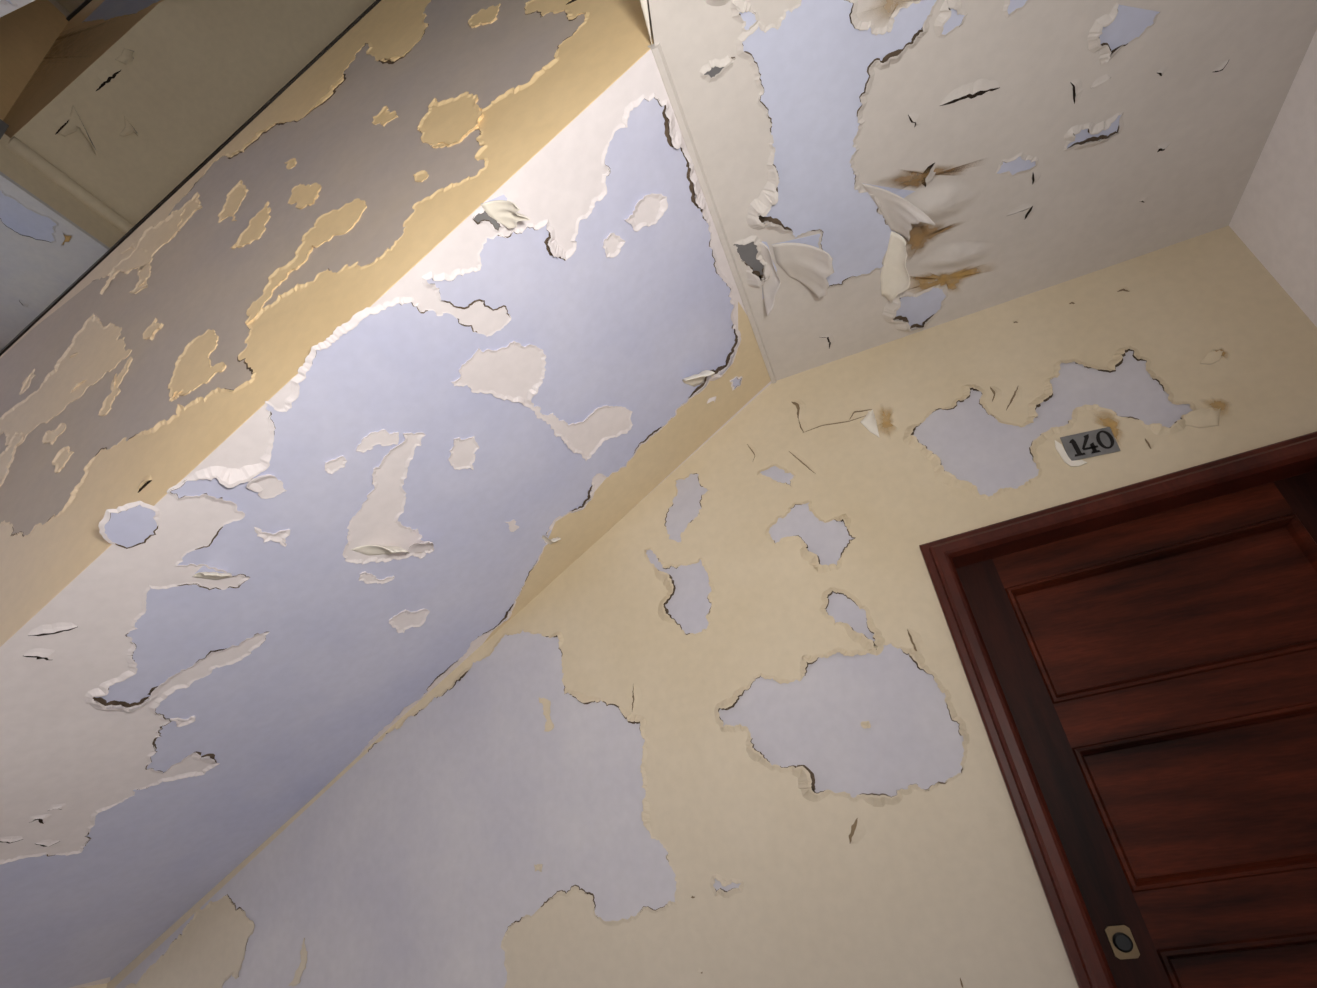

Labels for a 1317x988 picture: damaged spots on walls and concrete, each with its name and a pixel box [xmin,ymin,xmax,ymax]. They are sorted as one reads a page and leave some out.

peeling [1087,3,1162,65]
peeling [1063,111,1124,151]
peeling [0,0,969,988]
peeling [903,346,1221,501]